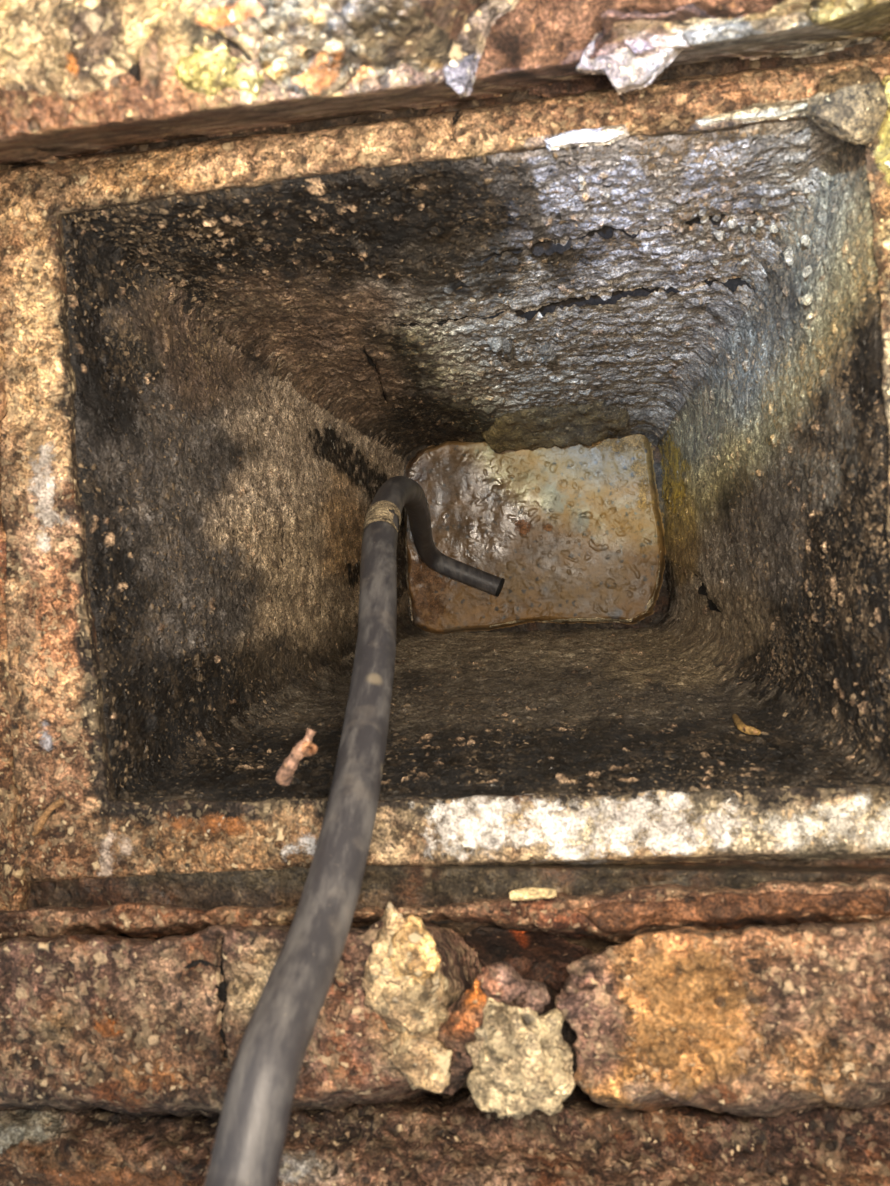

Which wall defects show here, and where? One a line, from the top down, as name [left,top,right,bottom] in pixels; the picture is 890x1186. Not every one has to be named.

crack [212,31,251,61]
spalling [439,0,786,98]
crack [142,933,228,1058]
corrosion [437,962,550,1095]
spalling [464,926,594,994]